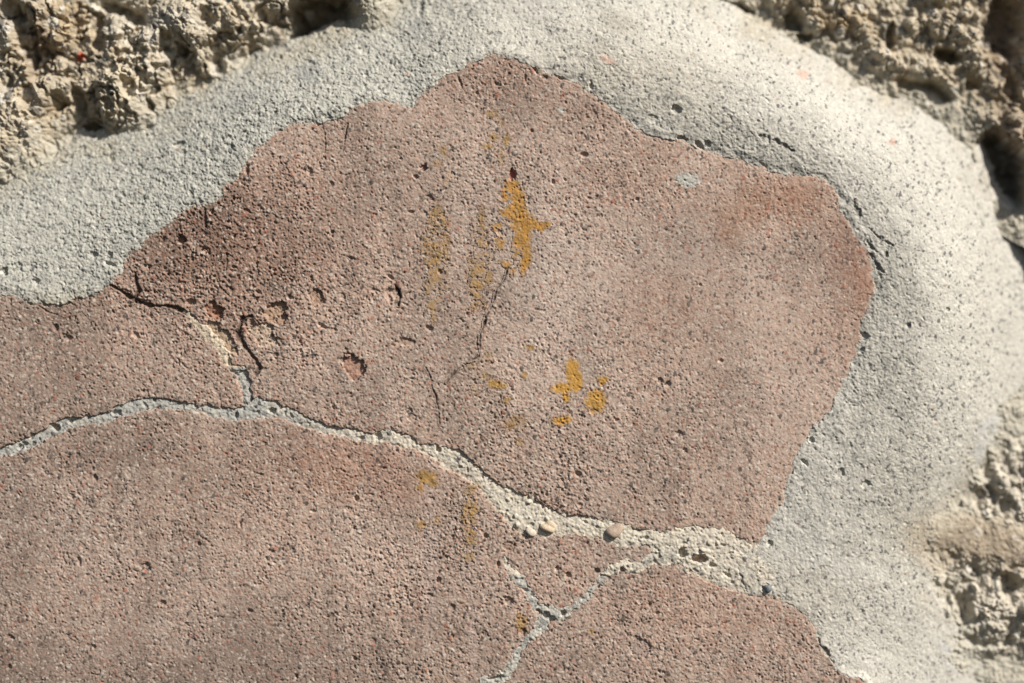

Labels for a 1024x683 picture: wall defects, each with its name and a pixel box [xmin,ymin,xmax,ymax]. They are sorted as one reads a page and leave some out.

spalling [0,0,406,188]
spalling [714,0,1024,247]
spalling [309,289,325,308]
crack [0,265,780,683]
spalling [930,385,1024,529]
spalling [931,561,1024,683]